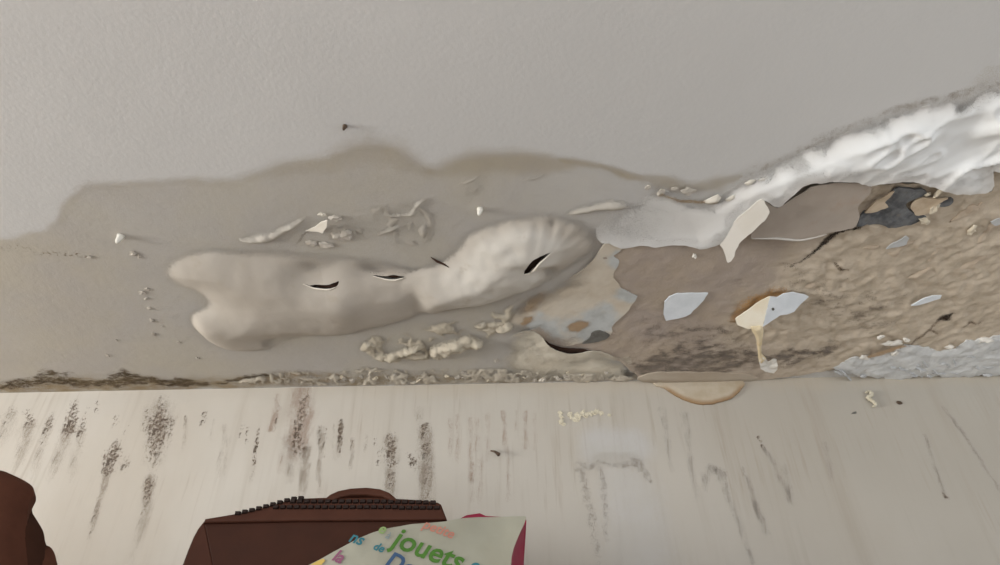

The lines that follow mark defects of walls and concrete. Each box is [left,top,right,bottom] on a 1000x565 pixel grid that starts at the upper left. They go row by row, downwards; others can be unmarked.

leakage [0,66,1000,505]
flaking render [238,89,1000,405]
leakage [87,425,129,539]
leakage [132,395,178,556]